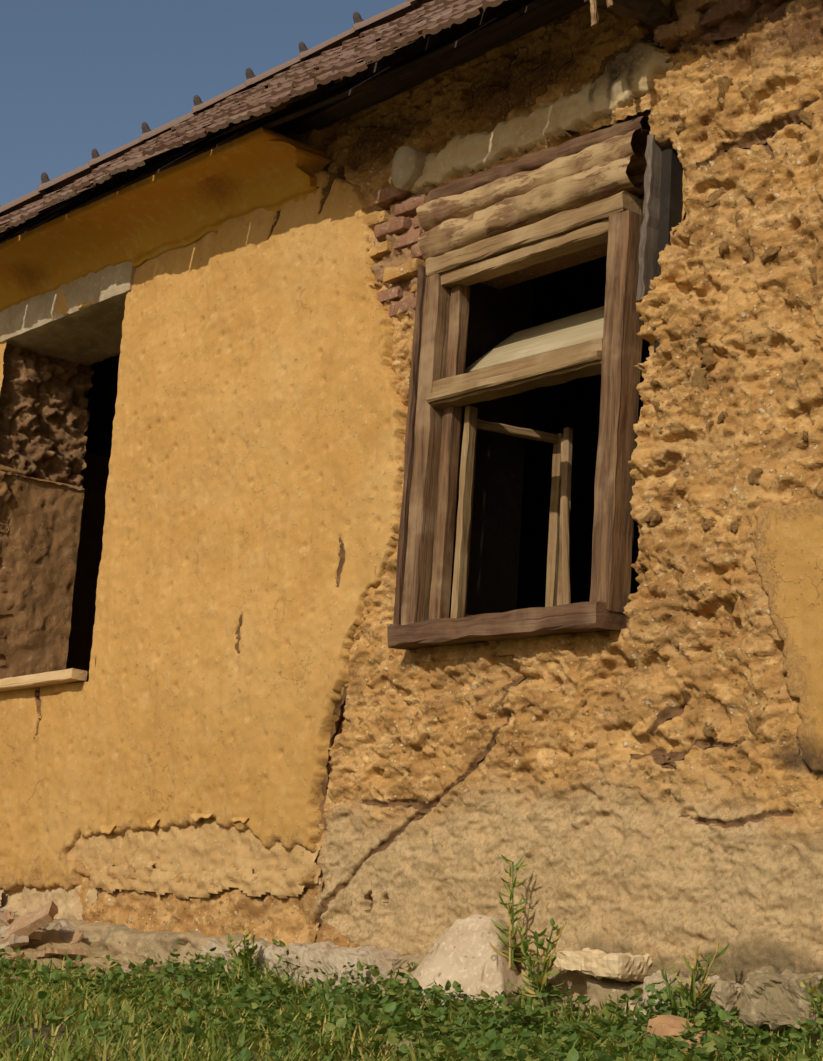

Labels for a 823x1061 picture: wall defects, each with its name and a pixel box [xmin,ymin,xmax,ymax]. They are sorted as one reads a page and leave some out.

crack [268,210,281,238]
crack [318,165,346,214]
spalling [308,0,823,976]
crack [335,537,345,587]
crack [235,615,243,654]
crack [34,688,42,739]
crack [630,694,745,771]
flaking render [67,813,321,883]
crack [315,676,526,930]
crack [678,808,793,828]
spalling [0,873,367,948]
water stain [318,789,823,983]